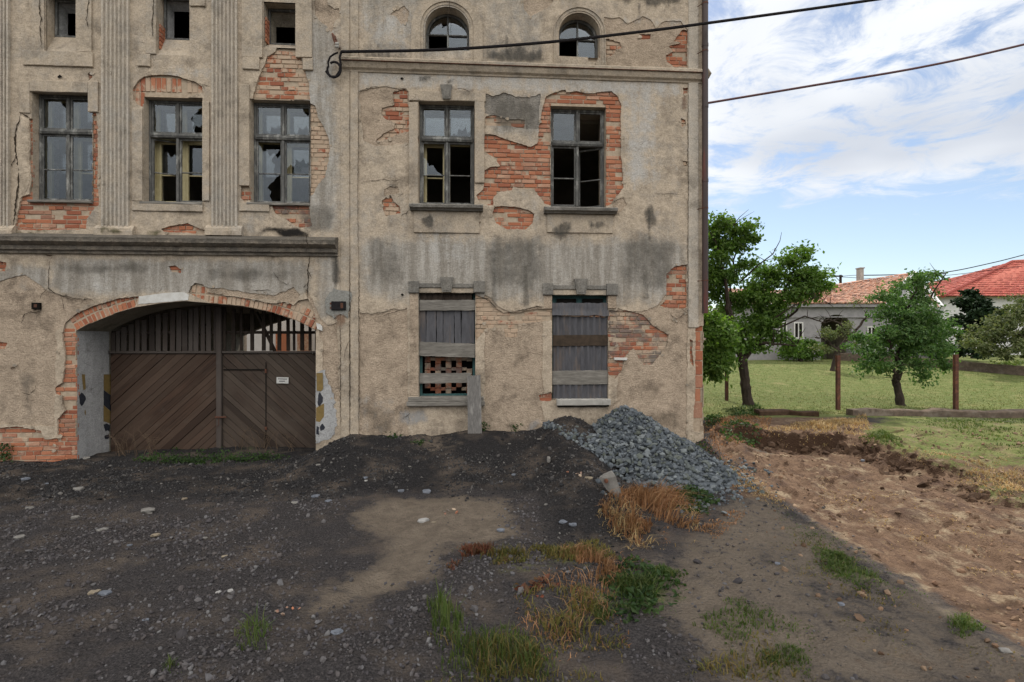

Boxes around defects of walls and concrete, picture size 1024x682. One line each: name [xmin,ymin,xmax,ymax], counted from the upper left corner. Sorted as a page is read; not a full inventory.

crack [11,113,29,225]
flaking render [16,113,101,230]
flaking render [130,72,203,107]
flaking render [162,223,205,235]
flaking render [254,17,332,228]
flaking render [359,77,419,146]
flaking render [379,183,403,216]
flaking render [476,89,627,229]
flaking render [588,15,689,68]
flaking render [0,262,138,462]
flaking render [190,283,340,407]
flaking render [607,264,706,438]